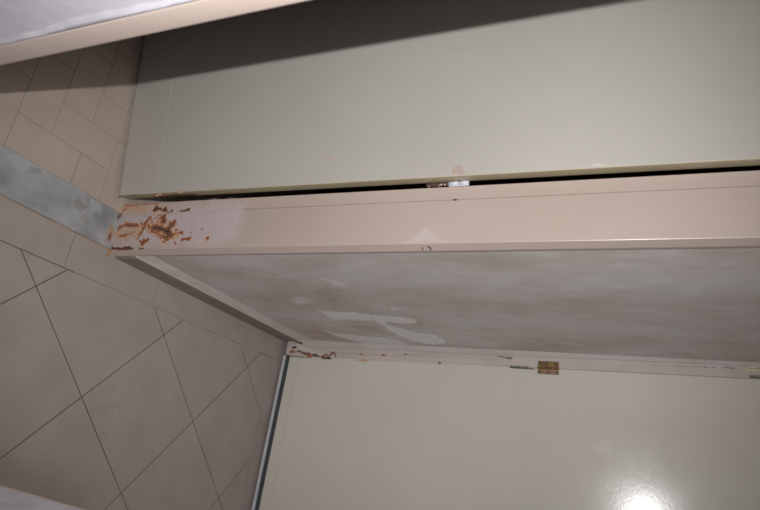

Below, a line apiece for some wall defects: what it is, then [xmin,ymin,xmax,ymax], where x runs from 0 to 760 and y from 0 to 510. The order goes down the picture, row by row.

corrosion [106,191,198,257]
flaking render [318,310,447,345]
corrosion [288,342,339,360]